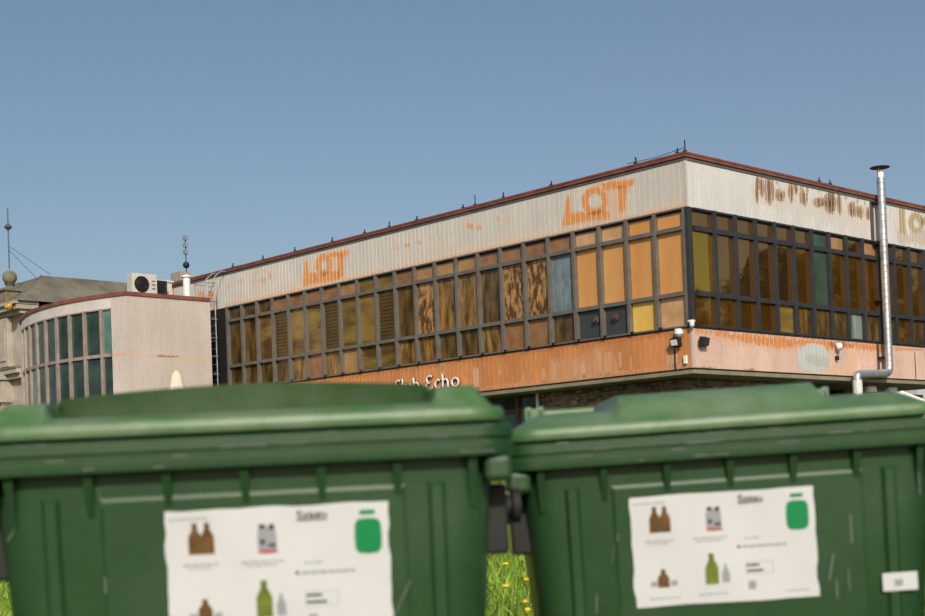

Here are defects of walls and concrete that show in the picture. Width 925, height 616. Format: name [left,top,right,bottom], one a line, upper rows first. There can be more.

rust [755,176,874,221]